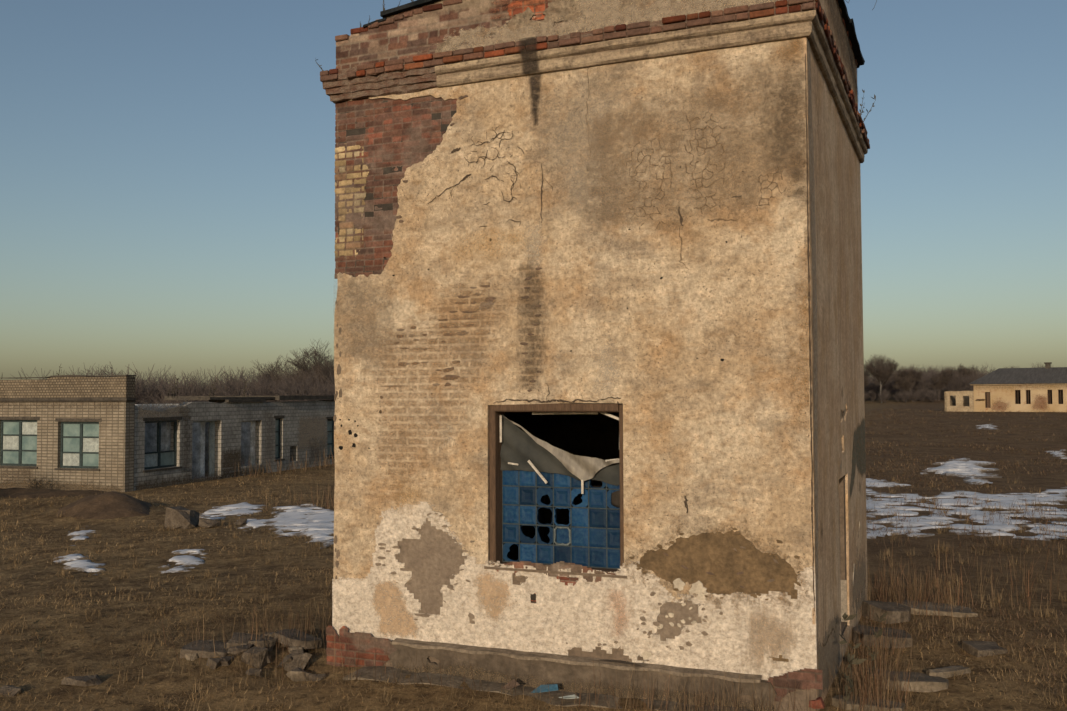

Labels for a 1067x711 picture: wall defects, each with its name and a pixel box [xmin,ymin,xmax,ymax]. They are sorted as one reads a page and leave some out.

flaking render [336,0,567,69]
damp [520,36,540,124]
damp [827,0,858,99]
spalling [334,95,468,279]
crack [427,126,553,227]
peeling [326,501,840,709]